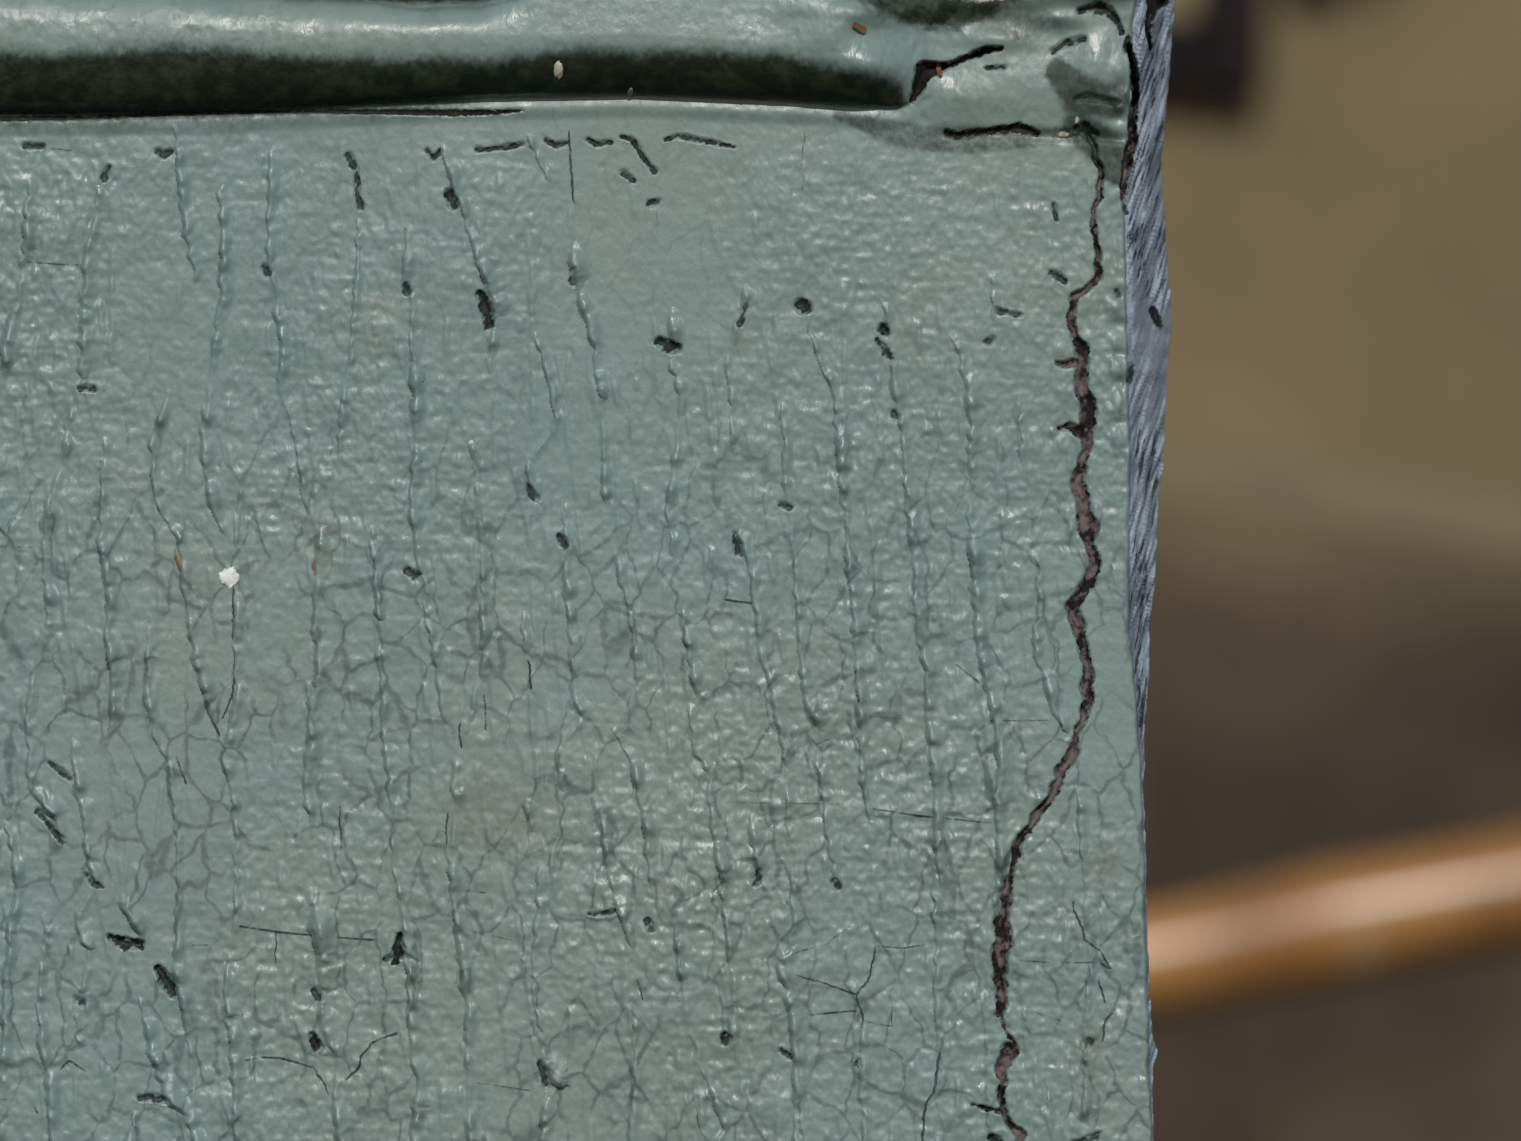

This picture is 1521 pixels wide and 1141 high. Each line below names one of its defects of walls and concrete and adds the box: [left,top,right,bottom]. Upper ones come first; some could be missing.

peeling [426,143,518,375]
peeling [586,135,657,183]
crack [909,46,1004,103]
crack [944,122,1039,140]
peeling [1078,0,1175,785]
crack [204,587,235,736]
crack [970,50,1140,1141]
peeling [24,674,153,952]
peeling [94,436,210,1141]
crack [245,1032,398,1092]
peeling [707,797,809,1141]
crack [921,1052,941,1141]